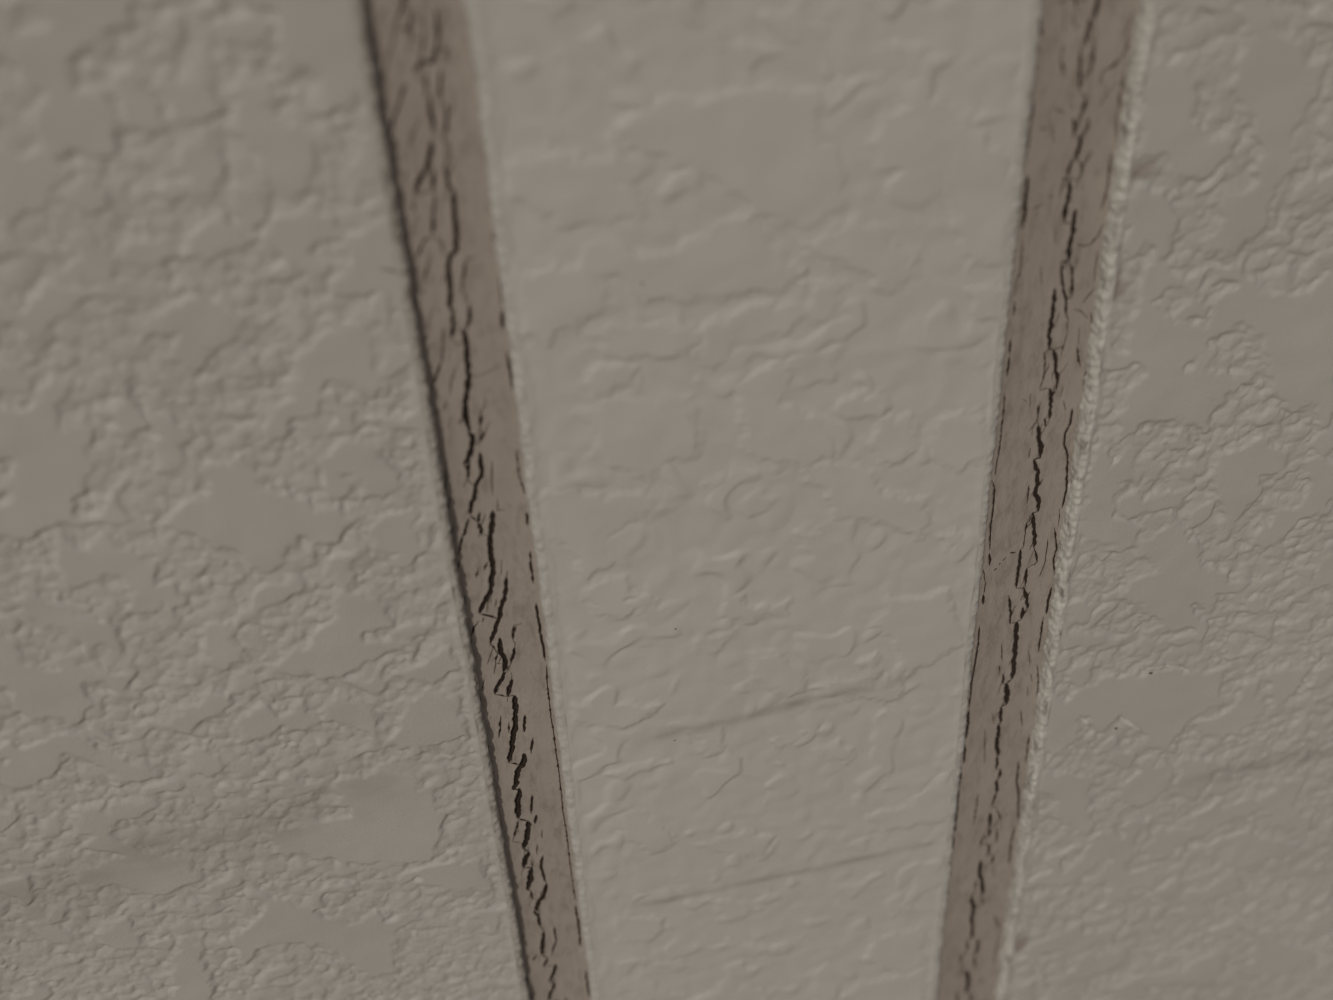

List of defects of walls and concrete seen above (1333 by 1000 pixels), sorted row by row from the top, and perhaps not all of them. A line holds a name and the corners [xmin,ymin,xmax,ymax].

crack [394,0,589,1000]
crack [947,0,1134,1000]